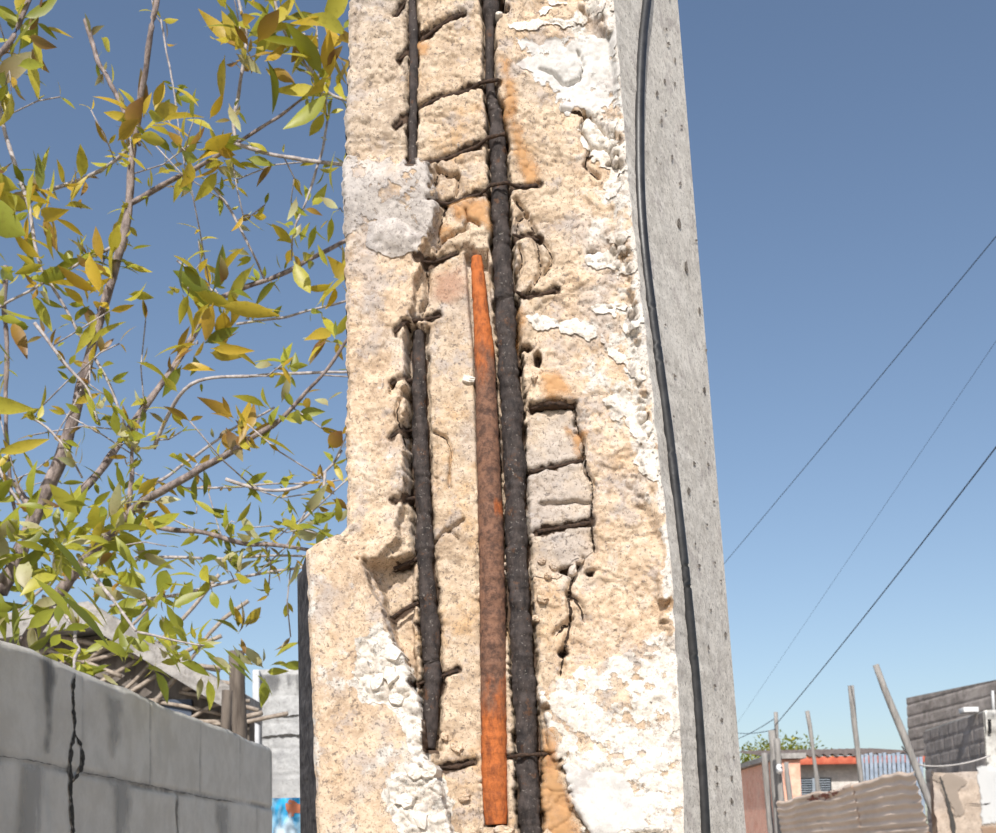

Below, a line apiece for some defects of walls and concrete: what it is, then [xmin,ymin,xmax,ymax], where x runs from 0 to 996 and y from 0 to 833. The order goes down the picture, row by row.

rust [392,93,444,138]
crack [563,111,596,179]
rust [412,251,450,271]
rust [508,217,578,415]
rust [388,425,416,512]
rust [393,310,442,471]
spalling [344,0,684,833]
rust [526,517,595,618]
crack [556,410,595,676]
crack [0,677,235,833]
rust [408,663,477,774]
crack [939,776,989,833]